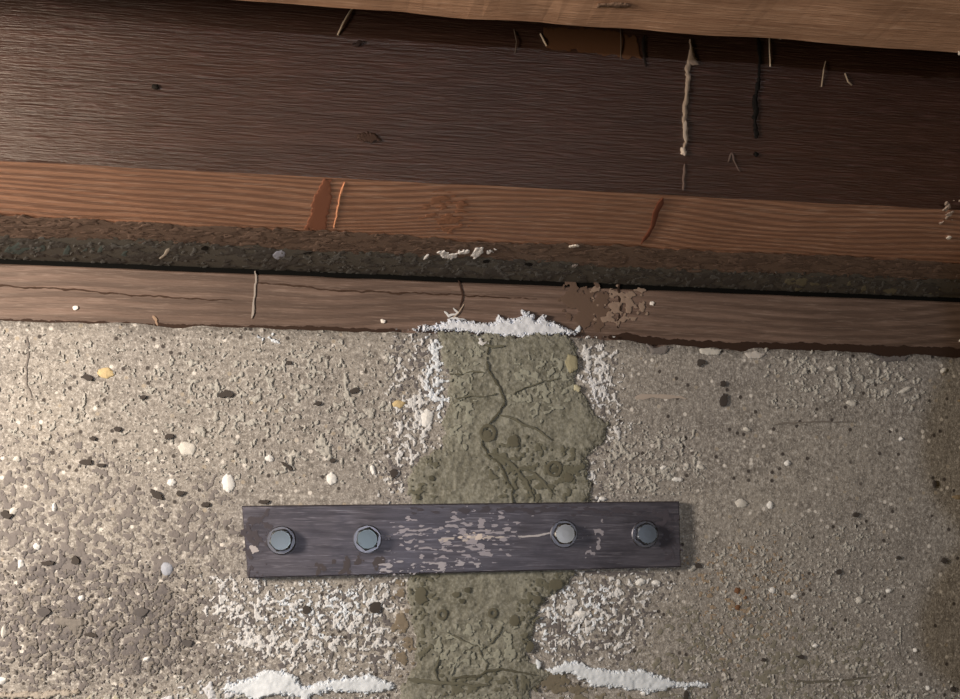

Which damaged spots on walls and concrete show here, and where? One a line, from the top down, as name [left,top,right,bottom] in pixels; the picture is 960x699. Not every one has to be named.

water stain [0,198,960,699]
crack [449,337,559,503]
crack [407,626,534,688]